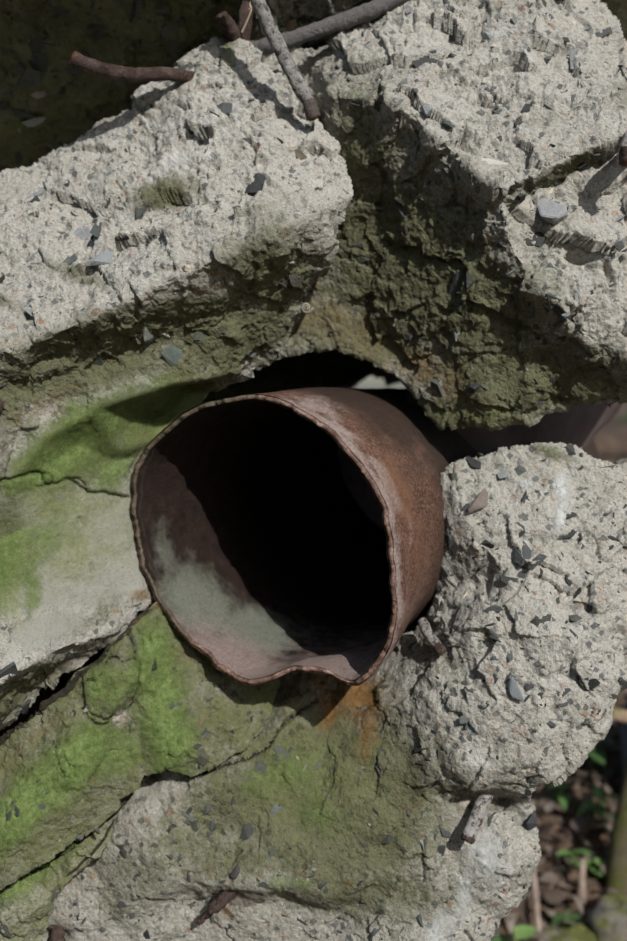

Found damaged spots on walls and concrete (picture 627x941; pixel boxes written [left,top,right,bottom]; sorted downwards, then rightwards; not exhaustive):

spalling [210,98,270,158]
spalling [231,172,265,193]
crack [0,455,126,498]
spalling [398,473,627,737]
spalling [0,635,123,714]
crack [0,609,150,745]
damp [52,712,197,783]
crack [198,701,314,776]
spalling [228,671,543,852]
crack [3,776,147,892]
spalling [36,780,166,941]
spalling [305,803,500,941]